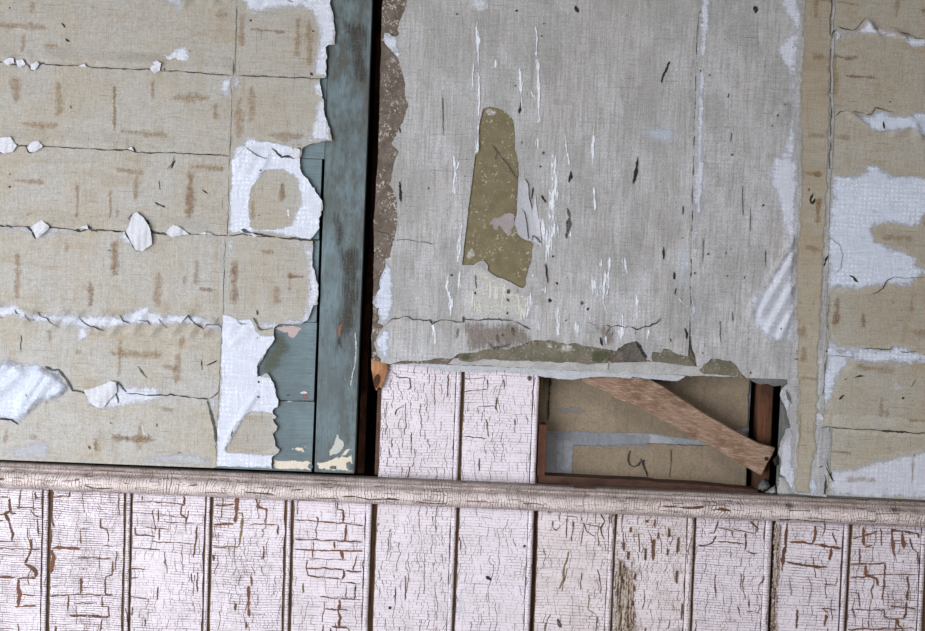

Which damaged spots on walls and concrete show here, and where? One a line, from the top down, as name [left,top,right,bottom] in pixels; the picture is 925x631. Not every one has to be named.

flaking render [371,0,408,362]
spalling [462,106,542,302]
peeling [275,326,302,338]
flaking render [392,327,788,386]
crack [0,478,446,631]
crack [523,503,605,618]